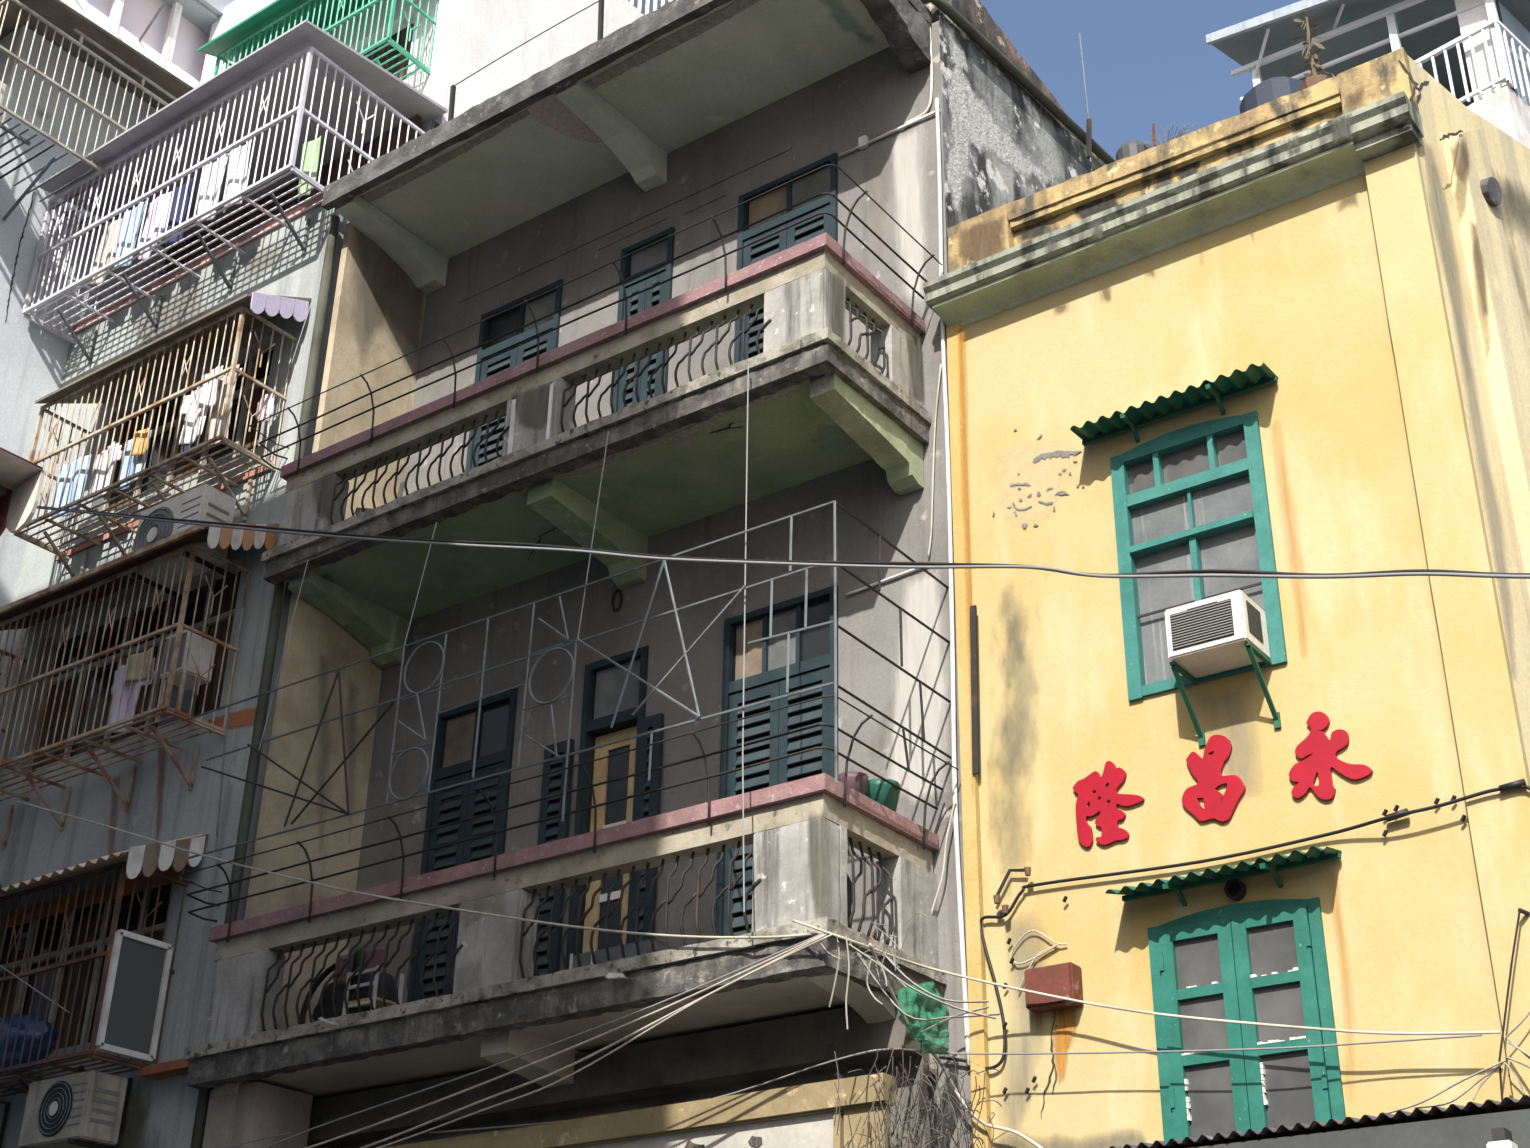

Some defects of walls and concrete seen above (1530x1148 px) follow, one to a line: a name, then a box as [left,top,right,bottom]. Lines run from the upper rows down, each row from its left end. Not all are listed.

water stain [961,7,1060,129]
water stain [1499,185,1530,229]
peeling [992,434,1084,529]
corrosion [1037,1008,1075,1077]